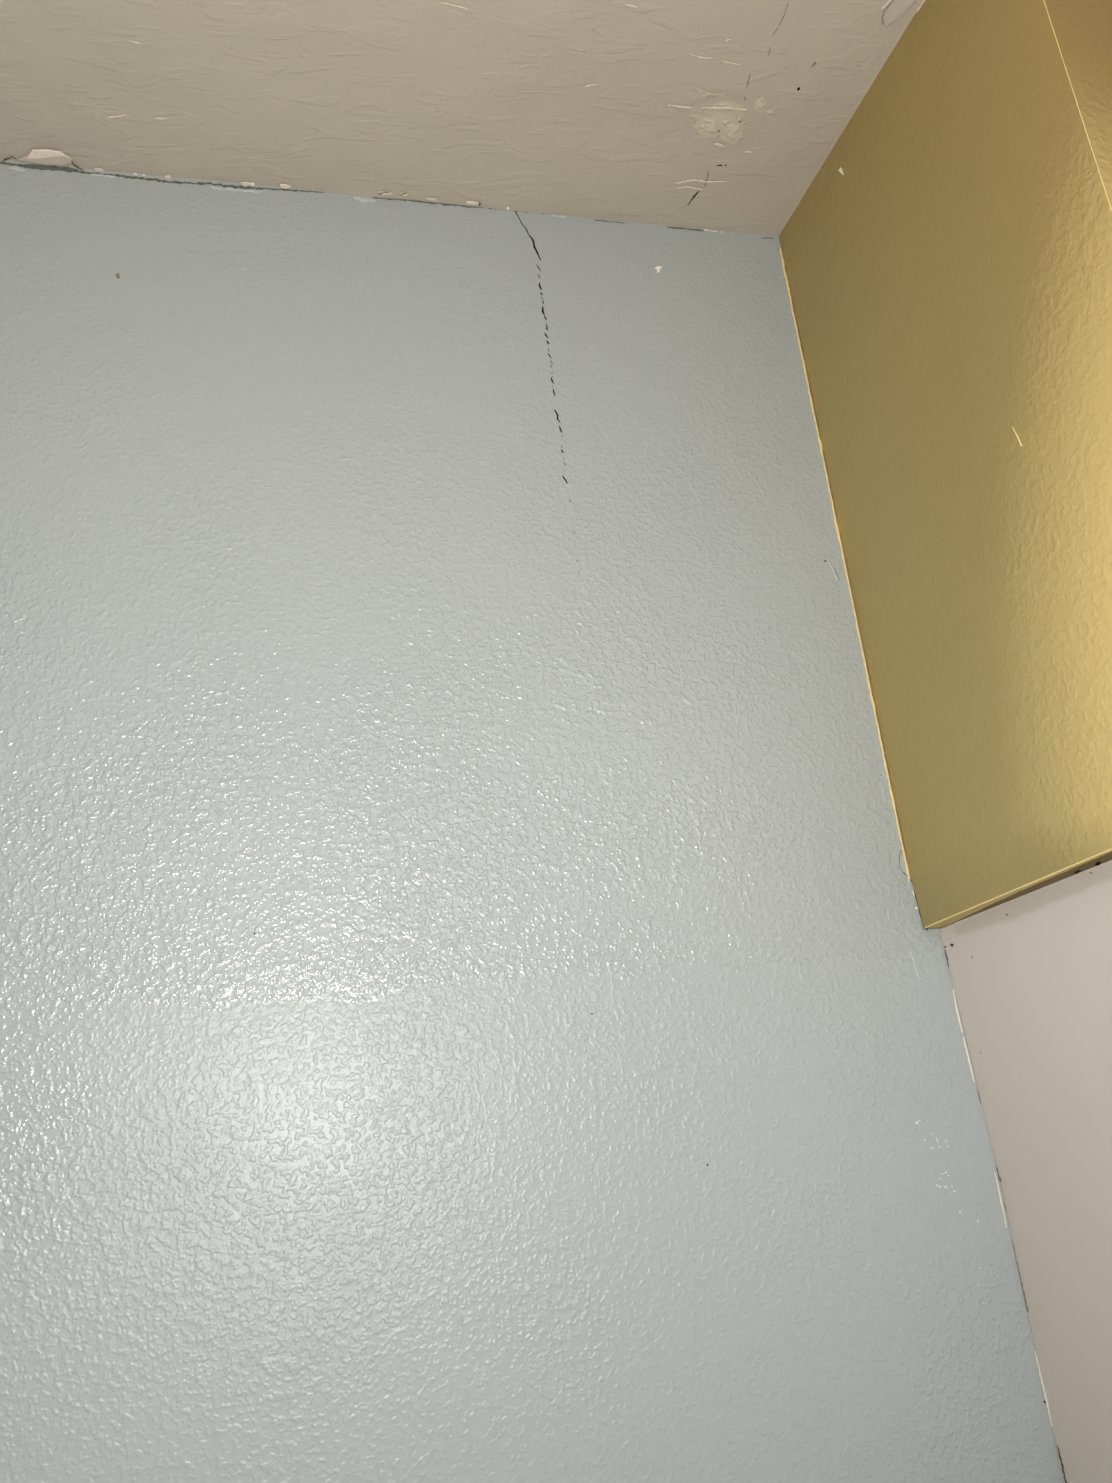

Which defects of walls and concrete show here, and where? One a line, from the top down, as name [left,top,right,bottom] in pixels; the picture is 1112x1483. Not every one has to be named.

crack [744,4,788,100]
crack [667,165,727,232]
crack [0,161,624,572]